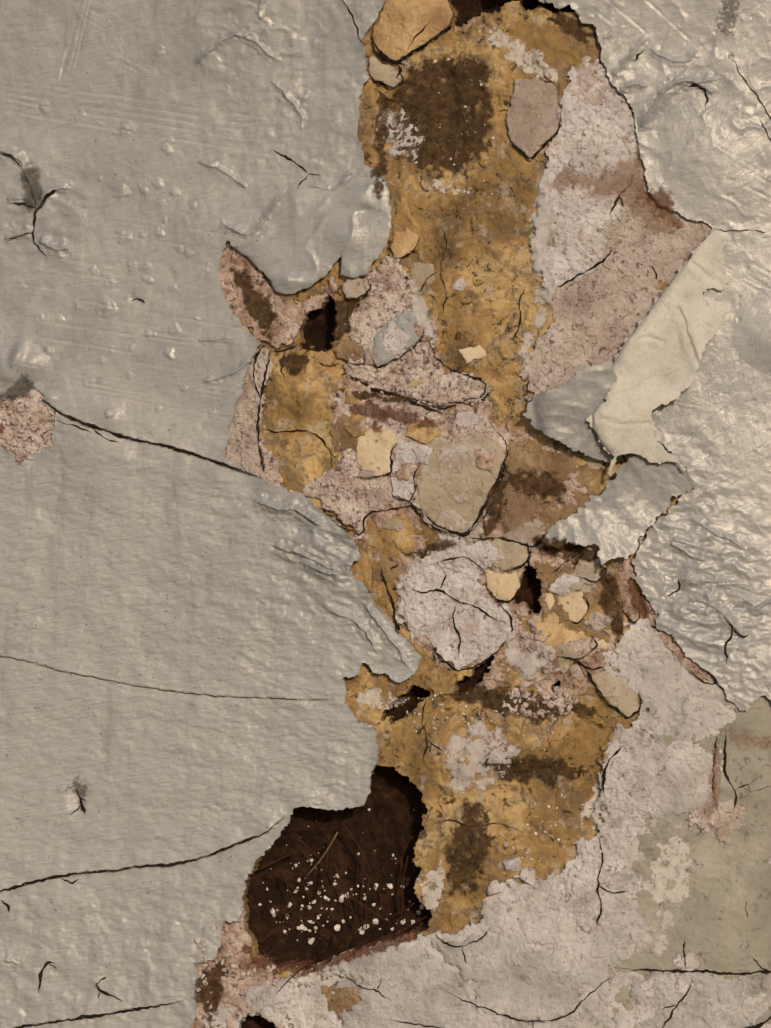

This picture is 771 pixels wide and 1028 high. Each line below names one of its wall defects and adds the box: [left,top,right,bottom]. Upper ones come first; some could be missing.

crack [0,152,56,258]
crack [273,150,320,188]
flaking render [0,388,56,464]
crack [42,345,336,476]
flaking render [190,0,771,1028]
crack [1,656,336,700]
crack [0,816,285,912]
crack [435,926,492,962]
crack [14,977,177,1028]
crack [346,975,440,1028]
crack [446,940,771,1028]